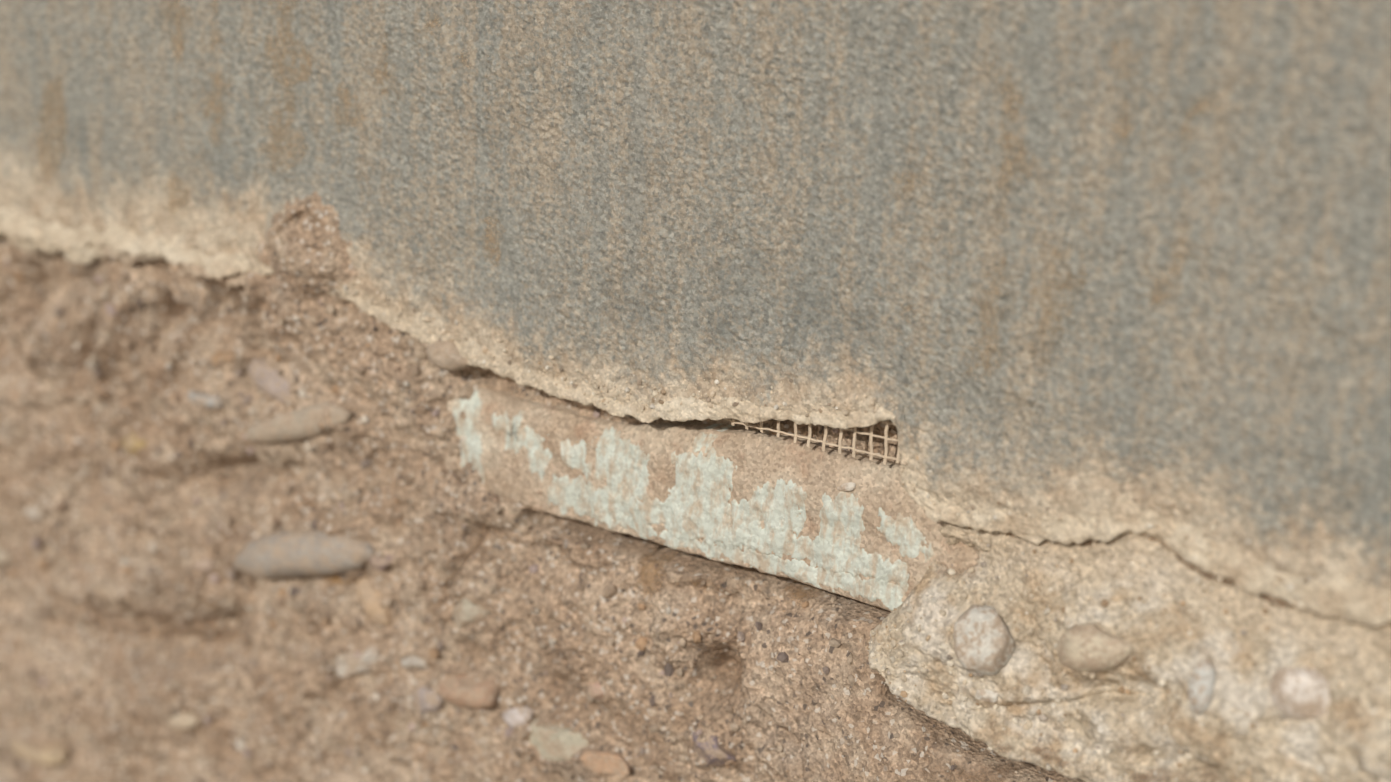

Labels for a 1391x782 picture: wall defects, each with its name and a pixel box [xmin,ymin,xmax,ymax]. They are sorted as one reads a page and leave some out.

peeling [0,208,259,288]
peeling [342,291,1391,627]
crack [980,530,1389,628]
spalling [129,635,201,682]